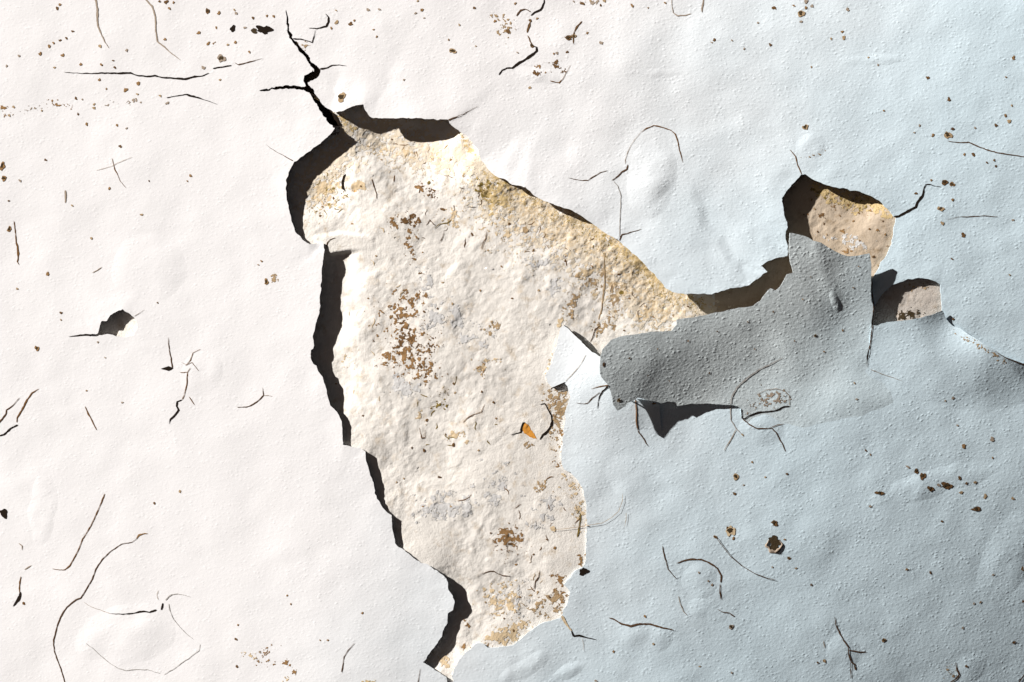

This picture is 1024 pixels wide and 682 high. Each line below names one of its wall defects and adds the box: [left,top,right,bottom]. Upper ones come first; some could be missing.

crack [67,0,262,104]
crack [260,11,349,144]
crack [499,1,544,74]
crack [894,184,940,217]
spalling [90,309,138,343]
crack [372,125,683,447]
crack [168,339,200,423]
spalling [286,92,1024,682]
crack [13,494,200,682]
crack [823,620,864,678]